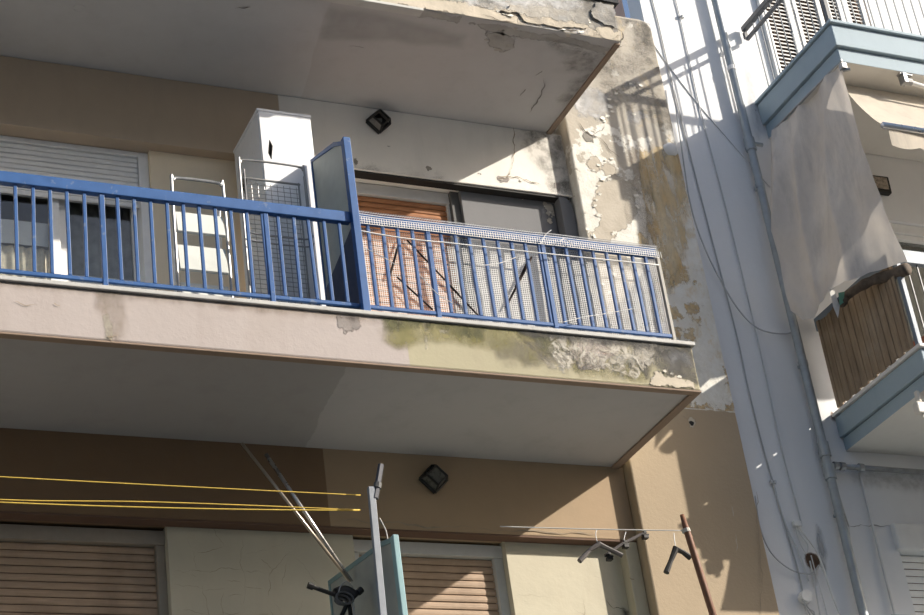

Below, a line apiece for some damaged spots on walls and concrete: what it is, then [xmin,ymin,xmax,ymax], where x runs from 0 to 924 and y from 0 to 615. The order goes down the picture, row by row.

spalling [380,0,620,55]
crack [478,2,624,48]
peeling [575,82,643,143]
crack [498,128,539,184]
peeling [583,156,639,243]
leakage [384,318,485,348]
leakage [520,331,698,383]
peeling [566,253,701,389]